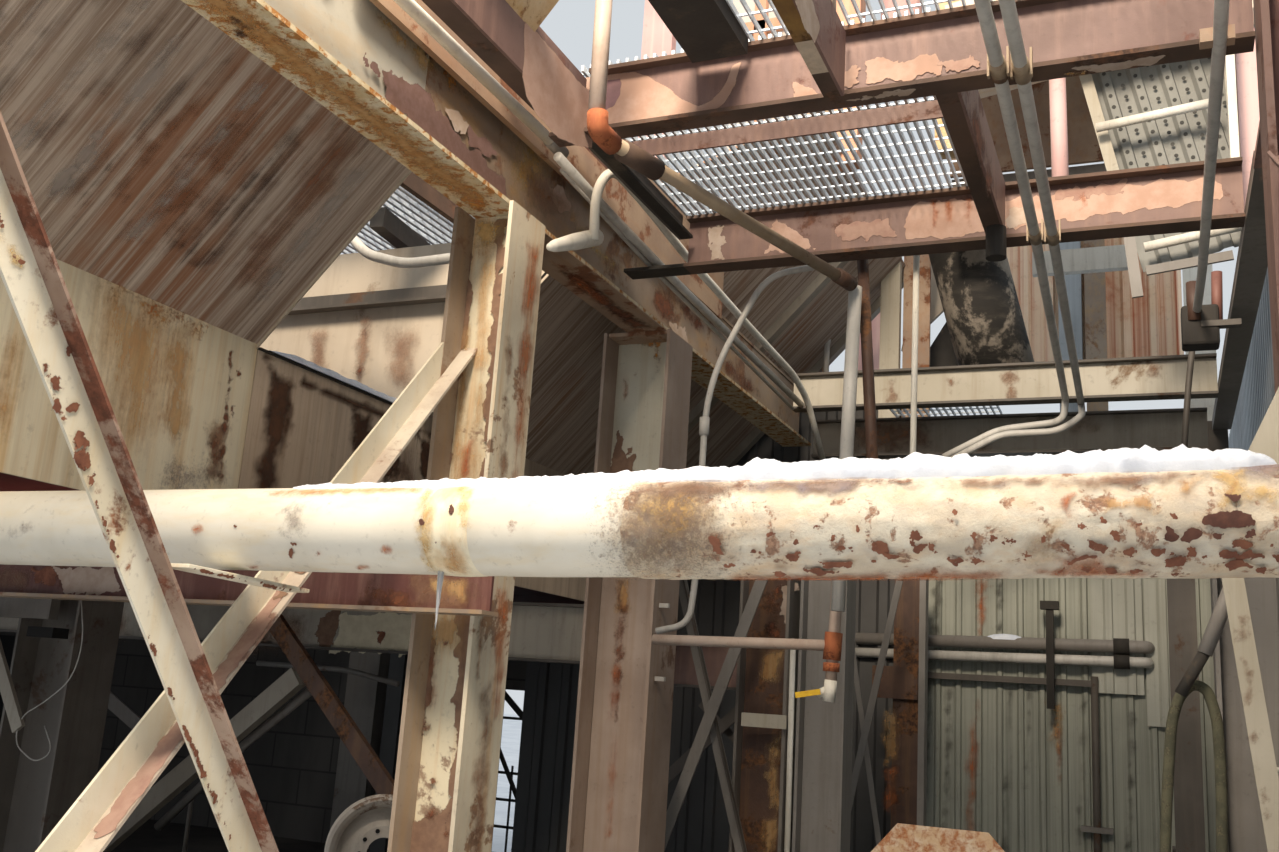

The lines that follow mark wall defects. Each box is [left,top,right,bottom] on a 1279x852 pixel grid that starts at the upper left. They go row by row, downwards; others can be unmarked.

peeling [844,54,980,88]
corrosion [199,0,500,290]
peeling [363,53,507,197]
peeling [835,198,984,242]
peeling [1005,177,1223,230]
corrosion [43,363,80,421]
peeling [479,219,508,477]
corrosion [73,430,96,486]
corrosion [1077,496,1152,542]
corrosion [901,530,991,618]
corrosion [757,571,884,680]
peeling [410,615,470,852]